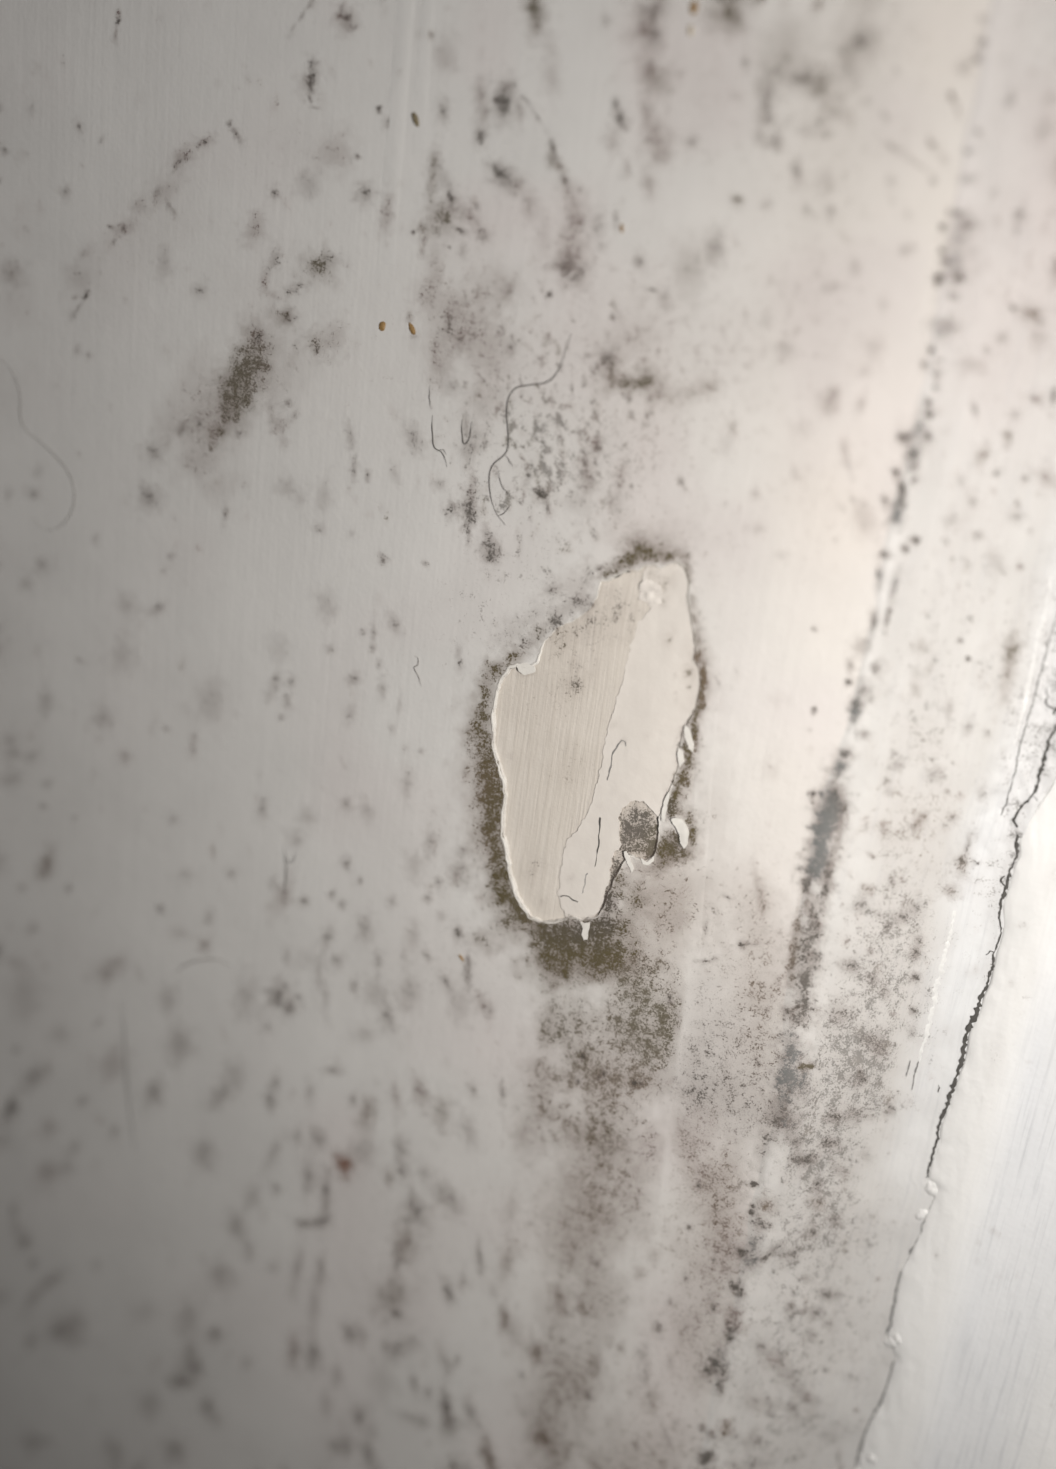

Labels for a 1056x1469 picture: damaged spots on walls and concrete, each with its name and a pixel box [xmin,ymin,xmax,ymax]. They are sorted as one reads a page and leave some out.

water stain [476,81,524,145]
water stain [287,254,333,294]
water stain [412,158,512,368]
water stain [547,143,618,297]
water stain [173,324,272,472]
water stain [594,350,656,389]
water stain [443,484,500,562]
water stain [846,318,950,738]
water stain [507,572,594,648]
peeling [464,537,708,986]
crack [906,620,1056,1178]
water stain [521,749,866,1469]